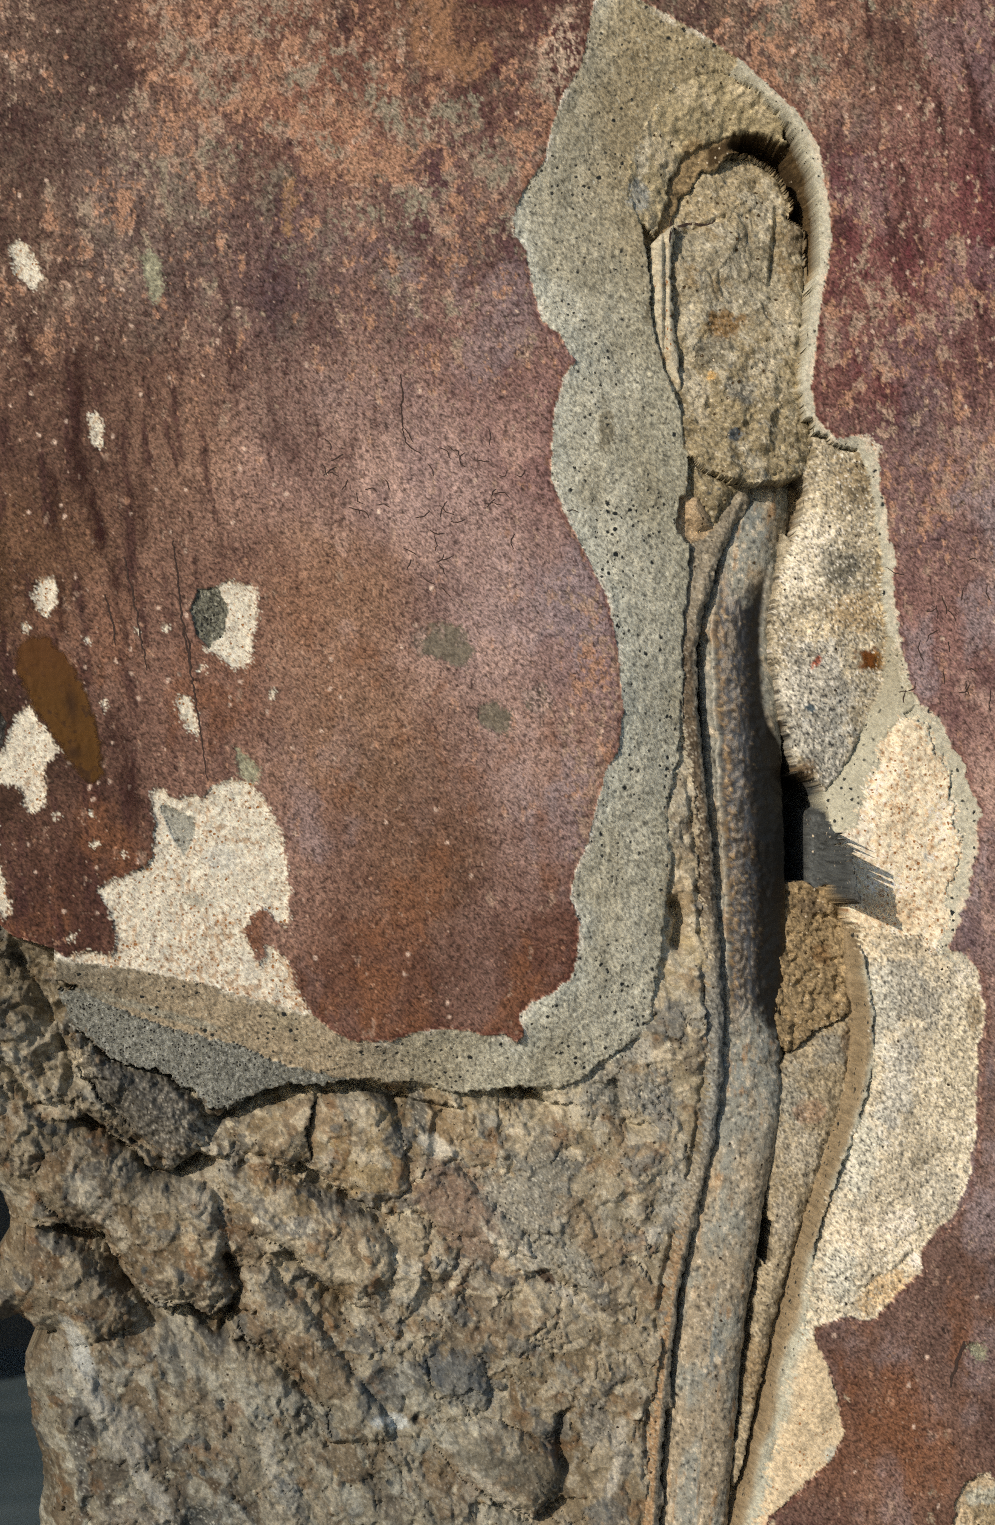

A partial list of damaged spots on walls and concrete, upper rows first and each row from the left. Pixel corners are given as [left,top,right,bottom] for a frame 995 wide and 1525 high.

peeling [9,239,43,290]
peeling [22,577,59,631]
peeling [0,704,61,821]
rust [15,636,103,783]
spalling [54,0,820,1525]
spalling [727,58,995,1525]
peeling [0,866,12,919]